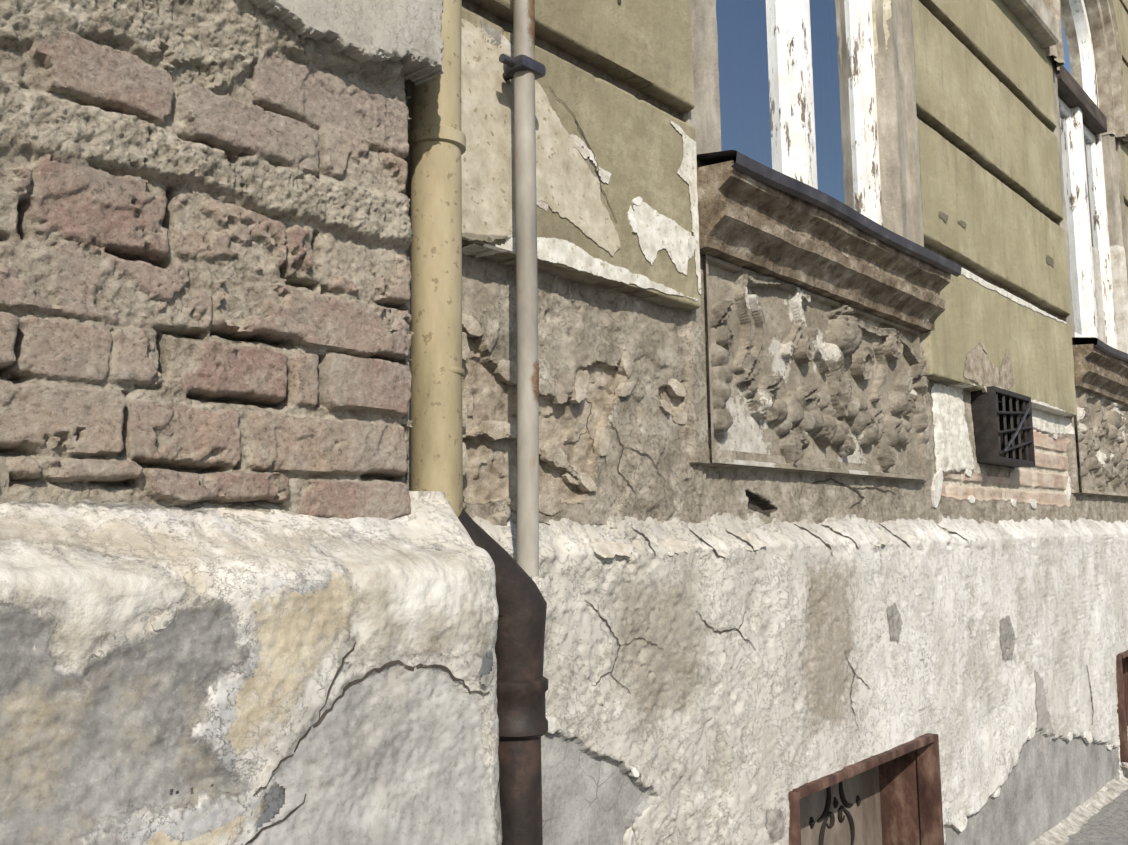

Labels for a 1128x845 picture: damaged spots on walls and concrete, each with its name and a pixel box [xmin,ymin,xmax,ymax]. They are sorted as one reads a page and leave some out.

peeling [250,0,444,85]
peeling [461,18,516,257]
peeling [535,80,701,301]
spalling [462,314,517,512]
spalling [539,349,634,515]
spalling [658,379,687,424]
crack [585,600,664,692]
crack [696,611,756,650]
crack [245,794,306,845]
crack [253,642,490,796]
peeling [541,716,659,845]
peeling [944,722,1121,845]